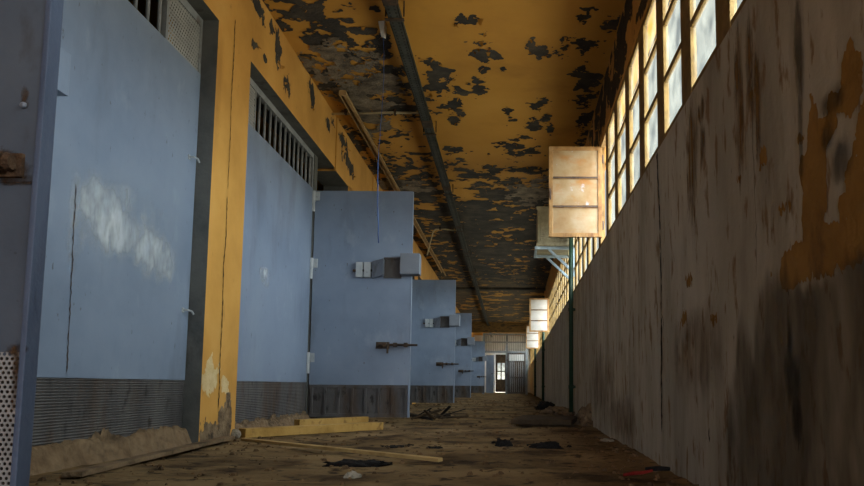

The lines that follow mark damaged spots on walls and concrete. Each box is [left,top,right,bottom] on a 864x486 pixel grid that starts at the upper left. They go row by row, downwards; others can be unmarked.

flaking render [251,0,555,323]
peeling [525,0,648,147]
peeling [771,36,864,290]
flaking render [199,352,232,441]
crack [218,201,228,406]
damp [728,283,855,486]